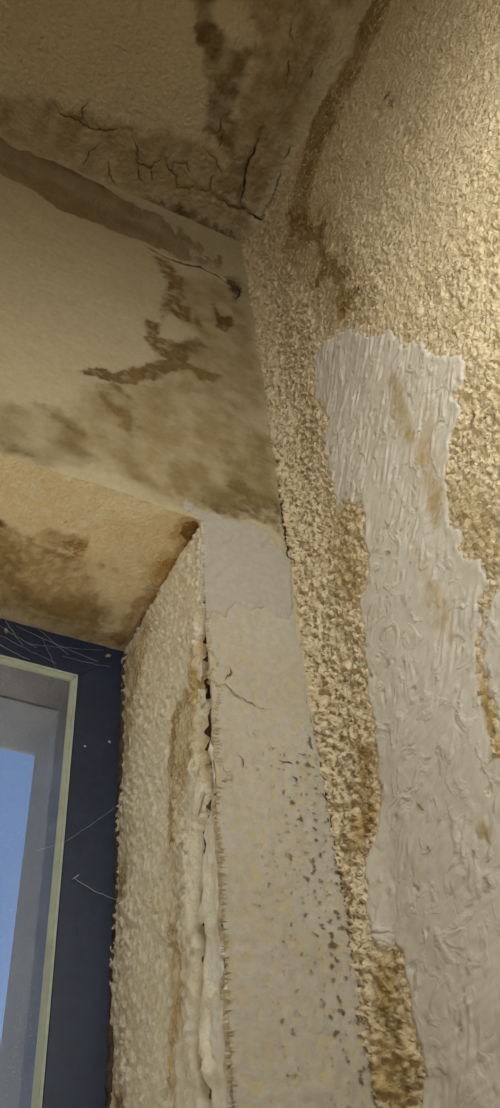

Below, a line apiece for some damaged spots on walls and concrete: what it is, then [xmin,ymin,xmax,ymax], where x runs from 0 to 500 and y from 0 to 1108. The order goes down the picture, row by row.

water stain [197,23,223,62]
water stain [206,50,250,146]
crack [56,100,292,220]
water stain [286,0,388,318]
water stain [156,257,202,326]
water stain [215,312,233,328]
water stain [82,320,221,428]
water stain [202,480,280,522]
peeling [184,522,238,1108]